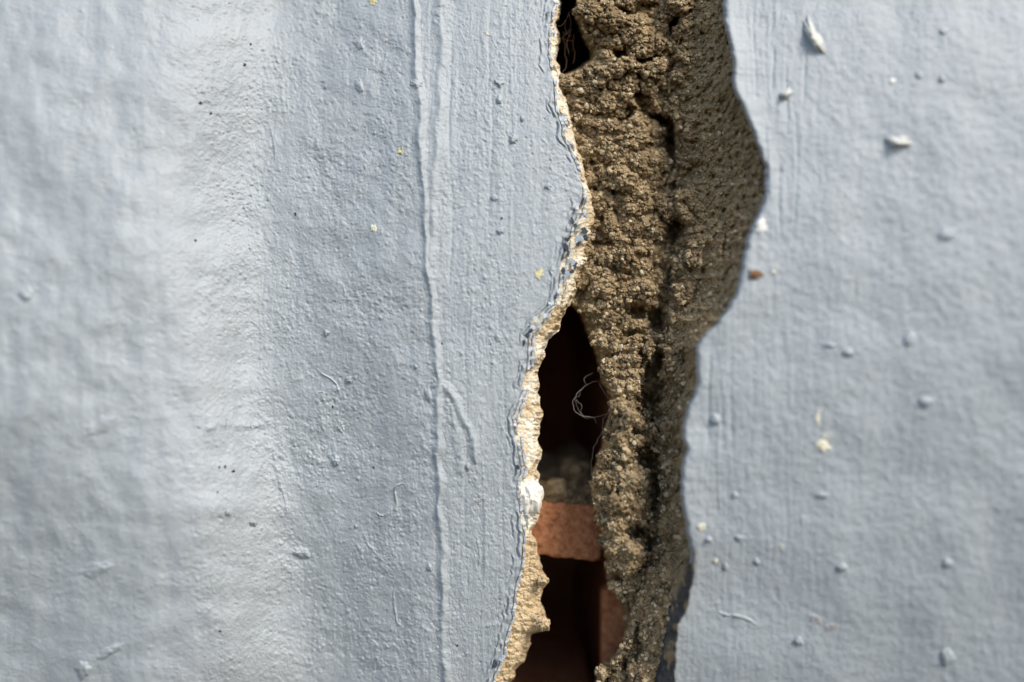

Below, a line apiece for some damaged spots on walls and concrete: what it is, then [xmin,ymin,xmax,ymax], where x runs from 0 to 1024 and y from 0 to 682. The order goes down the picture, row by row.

peeling [523,197,589,346]